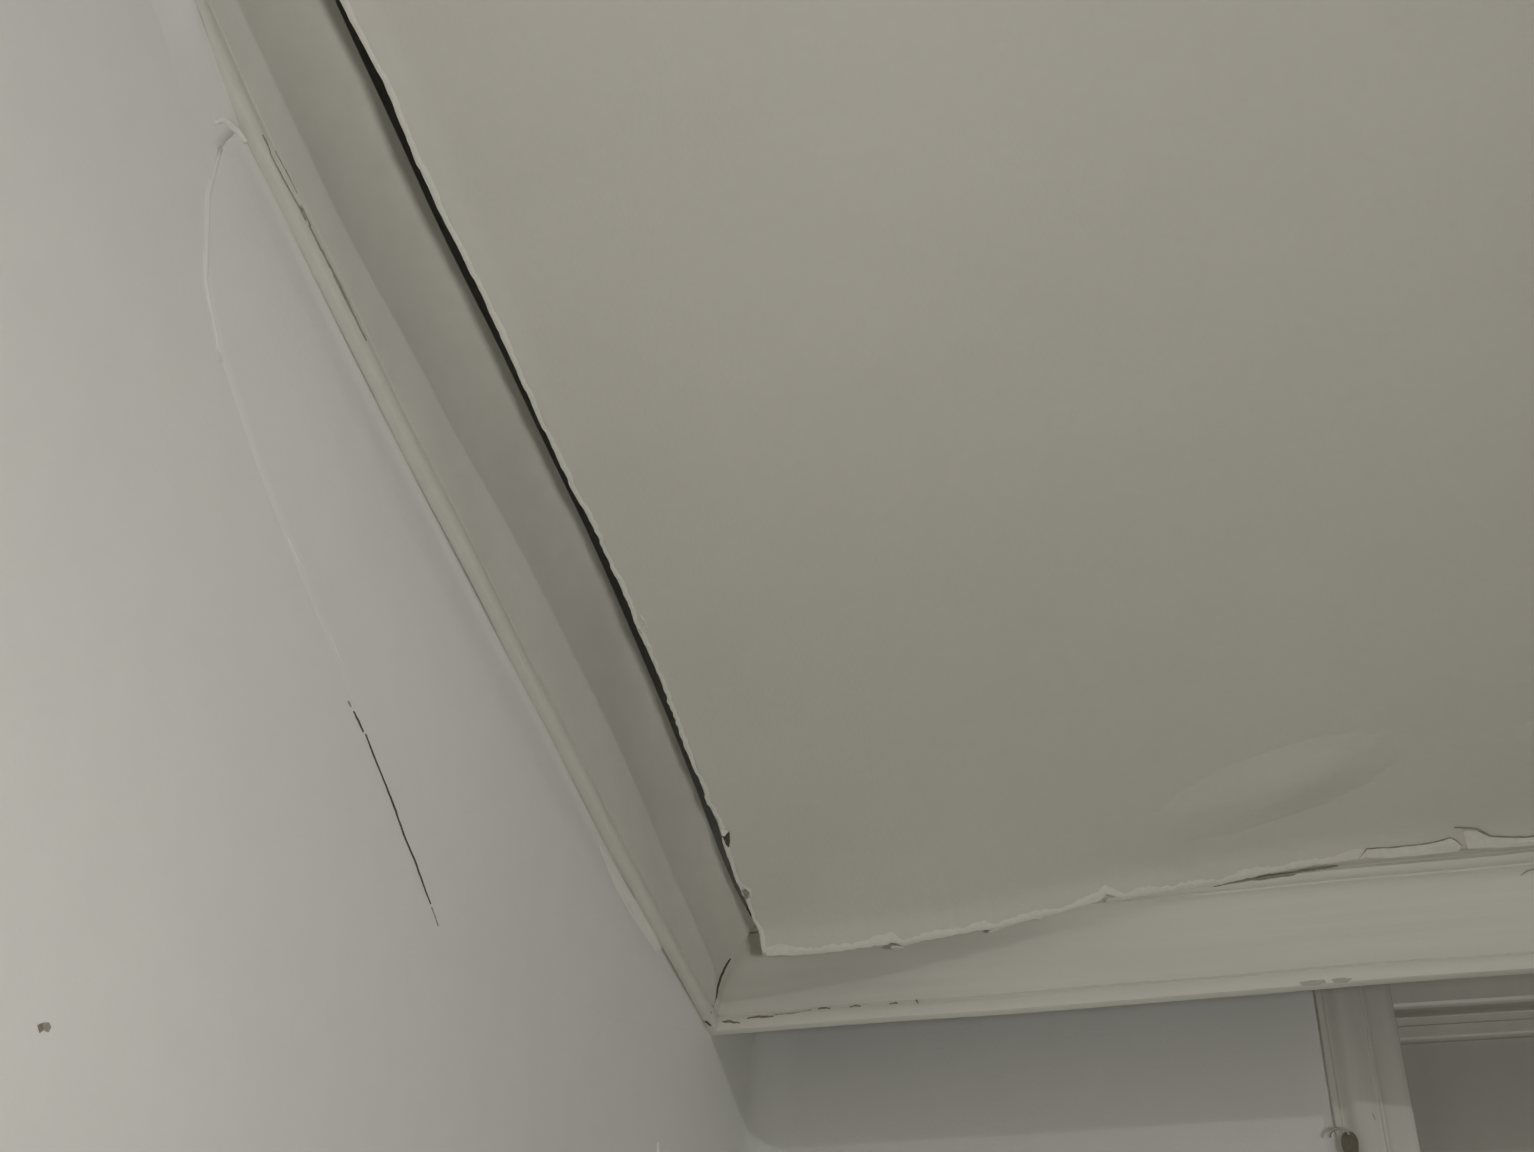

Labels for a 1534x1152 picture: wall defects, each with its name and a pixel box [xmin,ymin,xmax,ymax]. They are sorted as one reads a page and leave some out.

crack [348,701,439,926]
peeling [1359,827,1534,858]